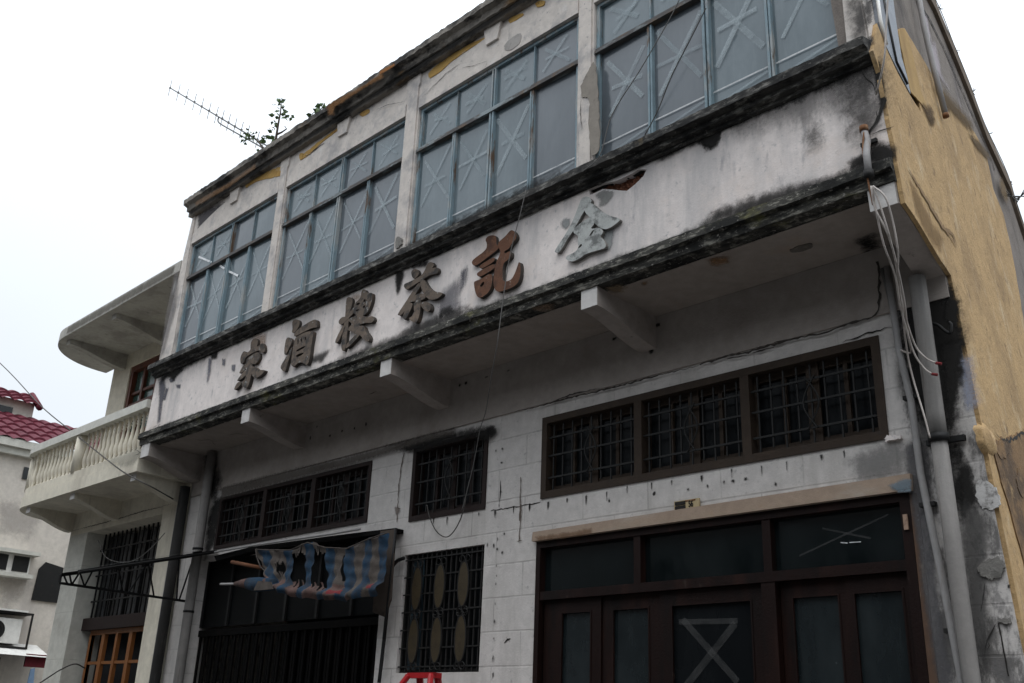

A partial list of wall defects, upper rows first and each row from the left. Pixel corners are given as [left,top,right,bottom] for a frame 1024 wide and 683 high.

peeling [581,62,601,156]
flaking render [592,171,645,193]
damp [658,131,721,160]
damp [683,142,897,233]
damp [772,61,885,129]
damp [897,307,927,426]
damp [394,426,496,452]
crack [491,477,540,542]
damp [929,275,990,668]
flaking render [975,431,1024,565]